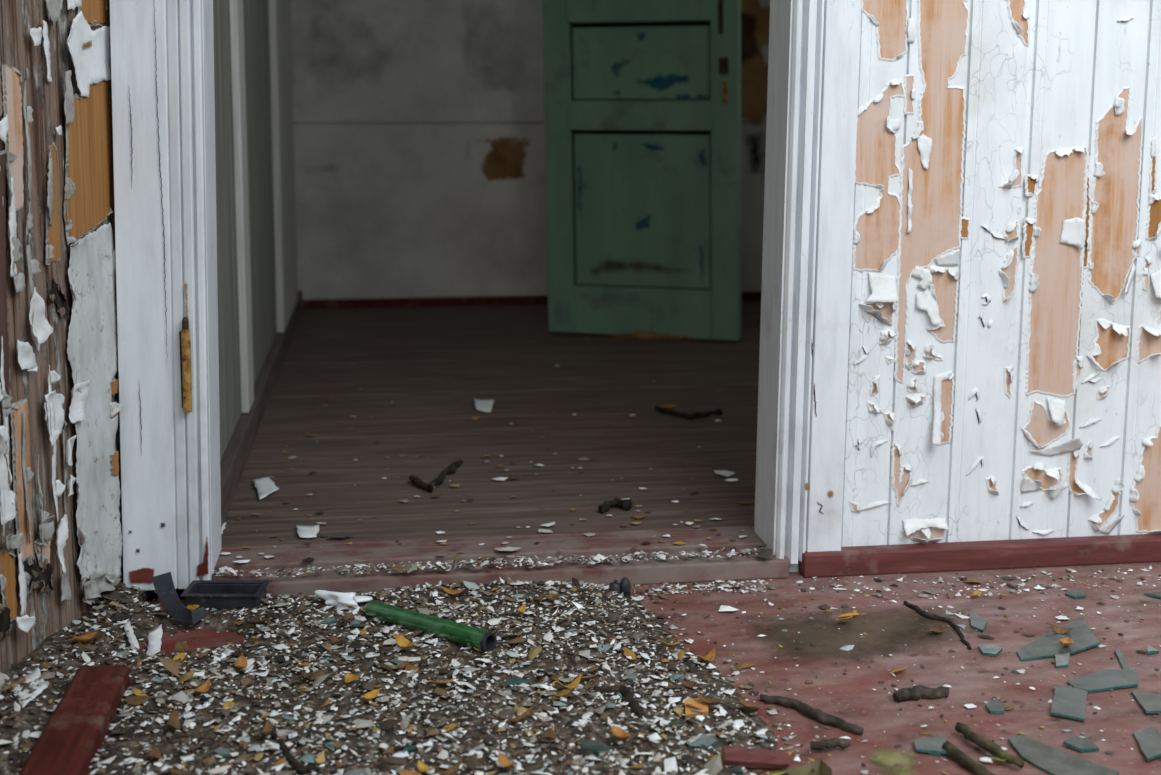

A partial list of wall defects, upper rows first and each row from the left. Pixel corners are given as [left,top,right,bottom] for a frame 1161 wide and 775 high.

peeling [741,0,770,124]
peeling [1007,0,1030,47]
peeling [478,137,529,180]
peeling [0,0,122,633]
peeling [852,0,971,543]
peeling [998,86,1161,534]
peeling [849,500,860,513]
peeling [985,476,999,495]